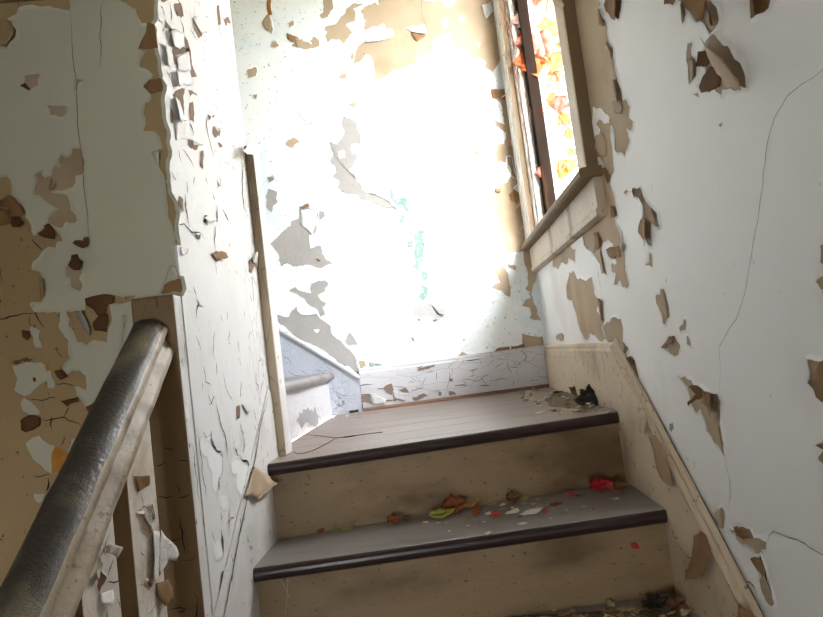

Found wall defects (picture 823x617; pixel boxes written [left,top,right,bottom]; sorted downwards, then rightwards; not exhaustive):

crack [0,302,44,328]
crack [32,383,84,446]
peeling [0,146,139,587]
crack [69,8,90,241]
peeling [110,0,223,245]
peeling [269,202,385,375]
peeling [261,0,501,81]
crack [457,358,532,387]
peeling [474,87,542,322]
peeling [553,0,662,380]
peeling [664,0,749,102]
crack [768,531,823,555]